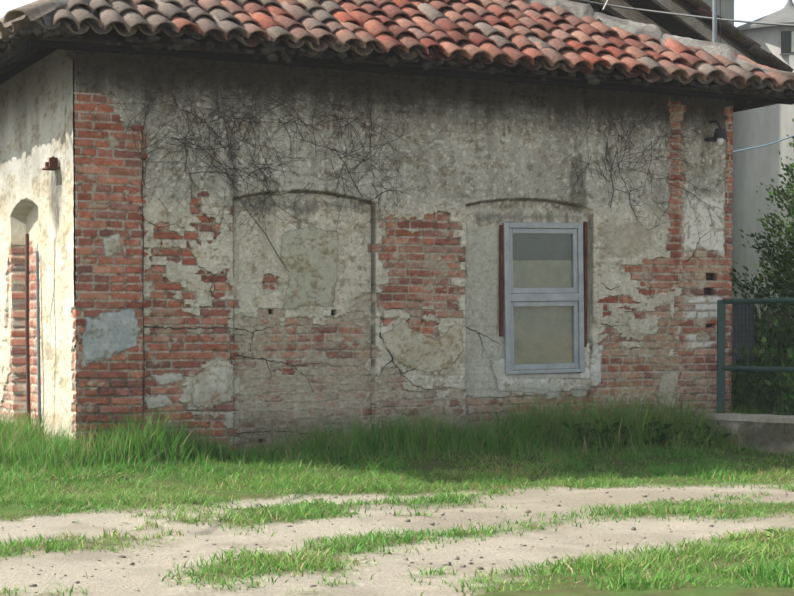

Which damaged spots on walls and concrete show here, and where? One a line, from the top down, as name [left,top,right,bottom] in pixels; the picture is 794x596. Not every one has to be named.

flaking render [70,89,734,453]